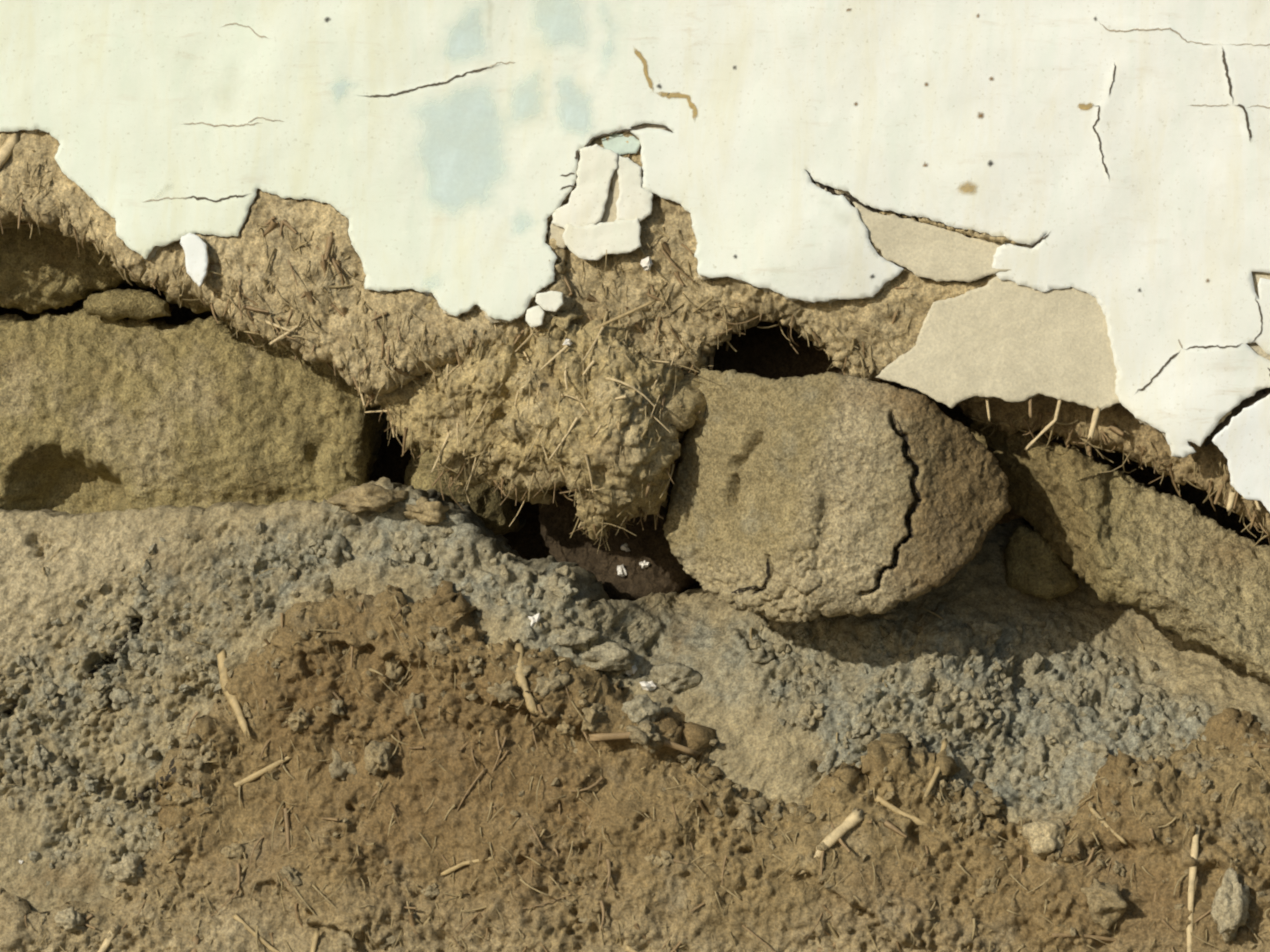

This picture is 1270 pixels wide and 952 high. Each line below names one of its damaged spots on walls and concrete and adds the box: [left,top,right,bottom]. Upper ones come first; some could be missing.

crack [186,117,283,127]
crack [366,62,515,97]
crack [1093,64,1116,178]
crack [1103,25,1270,138]
crack [145,194,246,202]
crack [811,177,977,239]
spalling [0,130,1270,545]
crack [1137,298,1263,391]
crack [1205,368,1270,447]
crack [863,415,922,596]